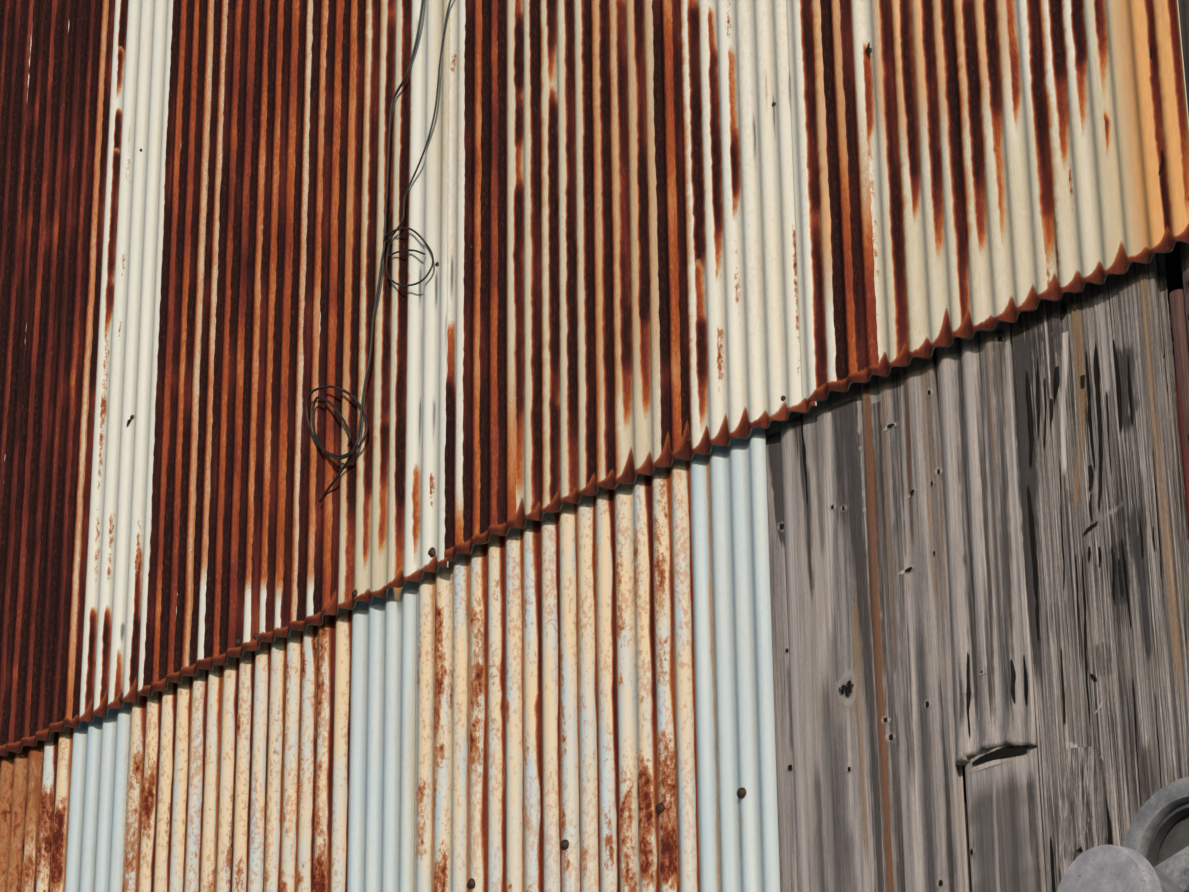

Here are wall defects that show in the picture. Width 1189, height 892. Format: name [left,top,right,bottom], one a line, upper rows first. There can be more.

corrosion [98,108,122,475]
corrosion [117,0,128,95]
corrosion [363,0,383,564]
corrosion [378,0,396,550]
corrosion [687,0,708,424]
corrosion [708,8,723,275]
corrosion [728,50,740,216]
corrosion [1048,0,1069,163]
corrosion [1071,0,1087,126]
corrosion [465,543,497,892]
corrosion [555,512,570,892]
corrosion [686,460,700,892]